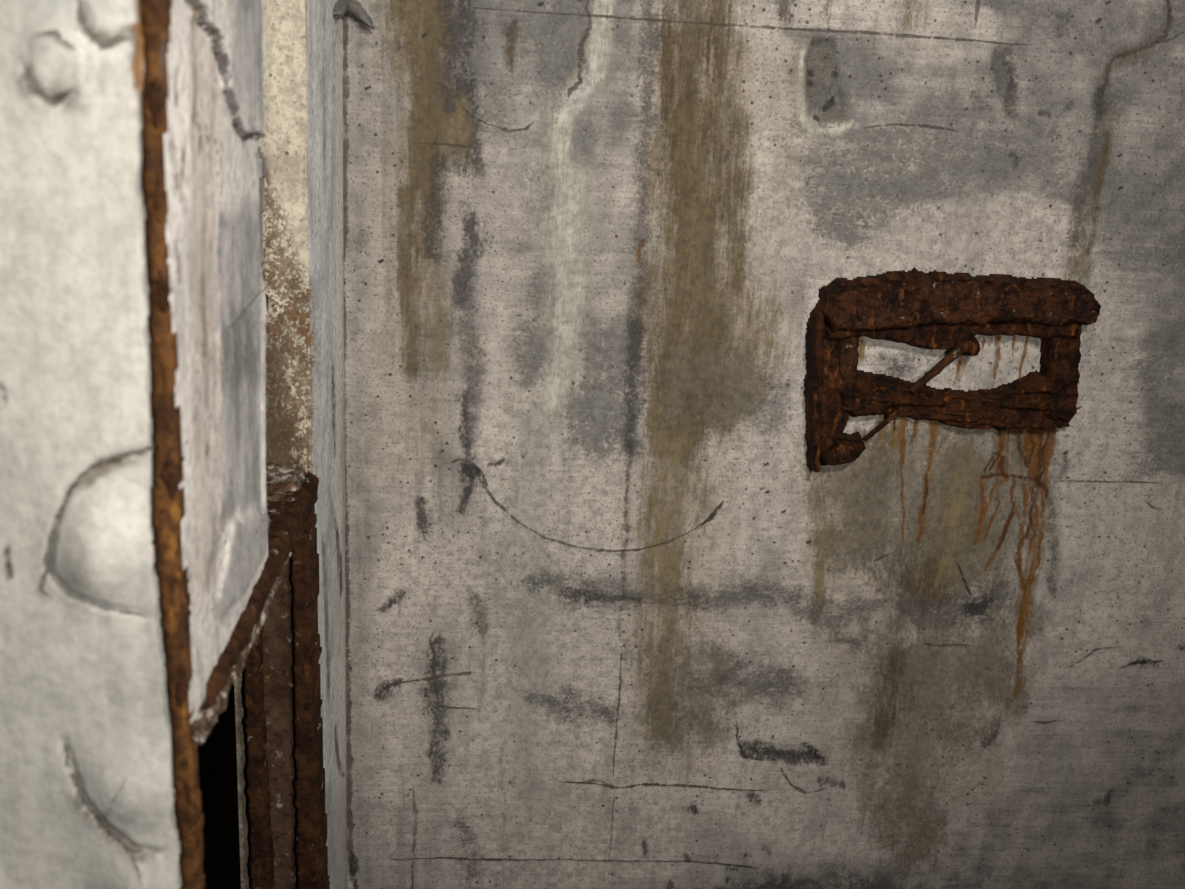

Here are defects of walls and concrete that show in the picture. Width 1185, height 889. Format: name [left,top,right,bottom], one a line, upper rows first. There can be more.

rust [133,0,144,89]
crack [187,0,268,326]
rust [262,225,316,473]
crack [342,15,350,378]
crack [329,461,476,889]
water stain [386,0,484,377]
water stain [459,334,482,515]
crack [565,652,767,818]
water stain [504,0,1067,875]
rust [838,271,971,288]
rust [879,416,942,542]
rust [974,428,1056,696]